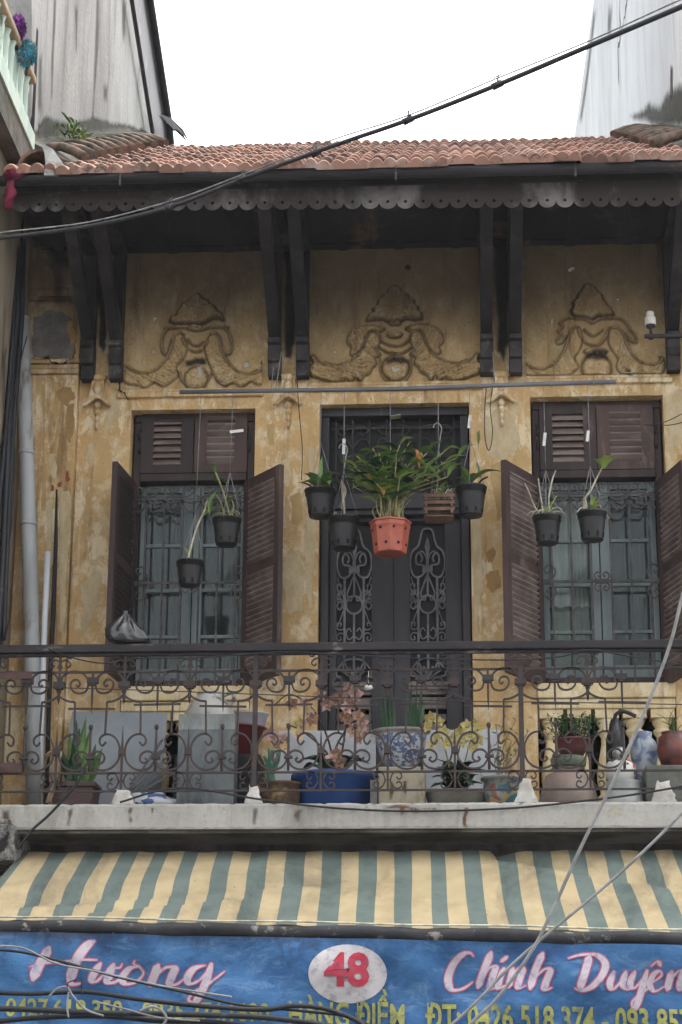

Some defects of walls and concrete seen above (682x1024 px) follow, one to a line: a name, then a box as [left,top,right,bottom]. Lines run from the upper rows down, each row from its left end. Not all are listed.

leakage [633,67,682,128]
flaking render [32,296,76,360]
peeling [483,399,520,521]
peeling [472,518,501,637]
rust [389,781,418,813]